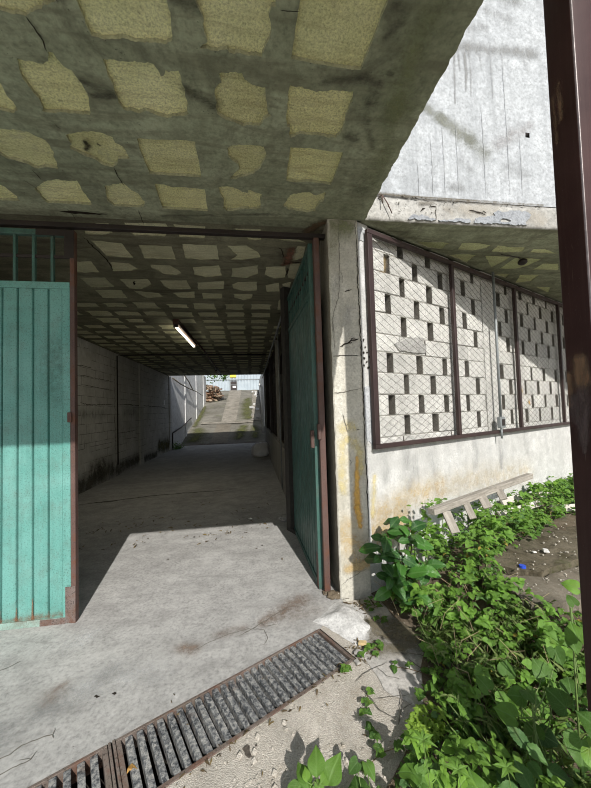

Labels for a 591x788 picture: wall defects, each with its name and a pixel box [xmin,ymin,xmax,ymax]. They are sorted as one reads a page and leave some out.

peeling [78,0,172,40]
peeling [18,52,90,111]
peeling [104,59,187,115]
peeling [215,72,268,123]
water stain [454,43,536,83]
peeling [67,131,128,165]
peeling [138,138,201,175]
water stain [437,114,489,155]
crack [332,222,369,536]
water stain [78,452,157,494]
rust [342,456,362,548]